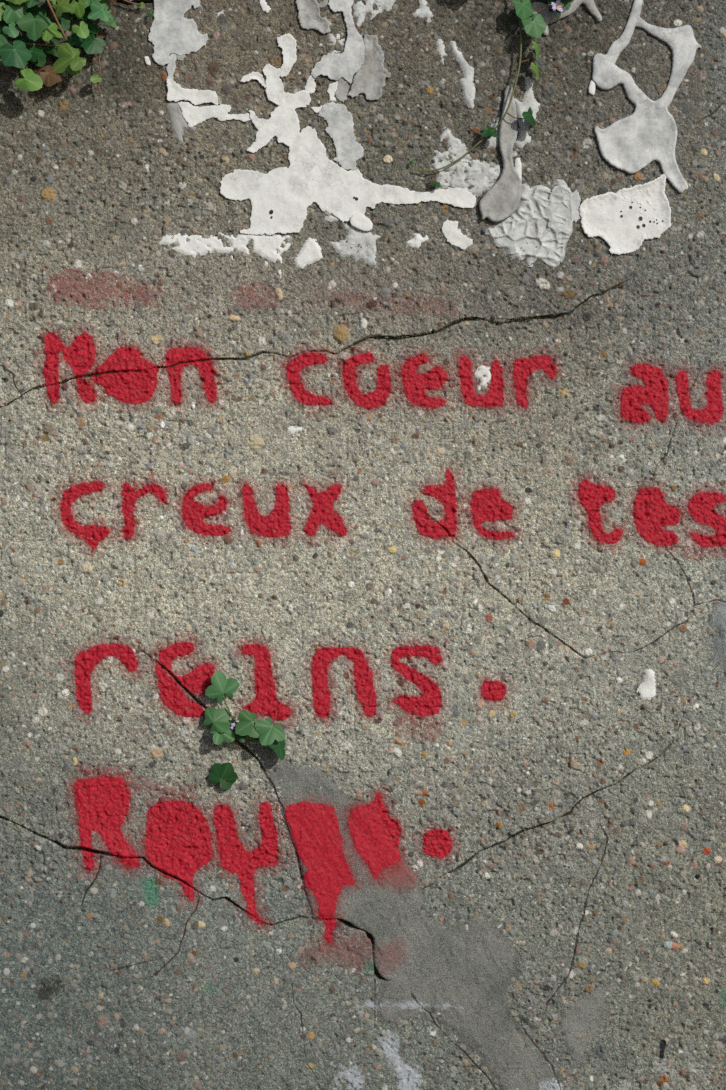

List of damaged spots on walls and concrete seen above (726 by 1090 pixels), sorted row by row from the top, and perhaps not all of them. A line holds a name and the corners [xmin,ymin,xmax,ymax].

peeling [144,0,701,278]
crack [0,279,630,408]
crack [144,652,207,708]
crack [461,547,584,658]
crack [612,343,726,653]
crack [0,740,496,1089]
crack [452,663,720,1090]